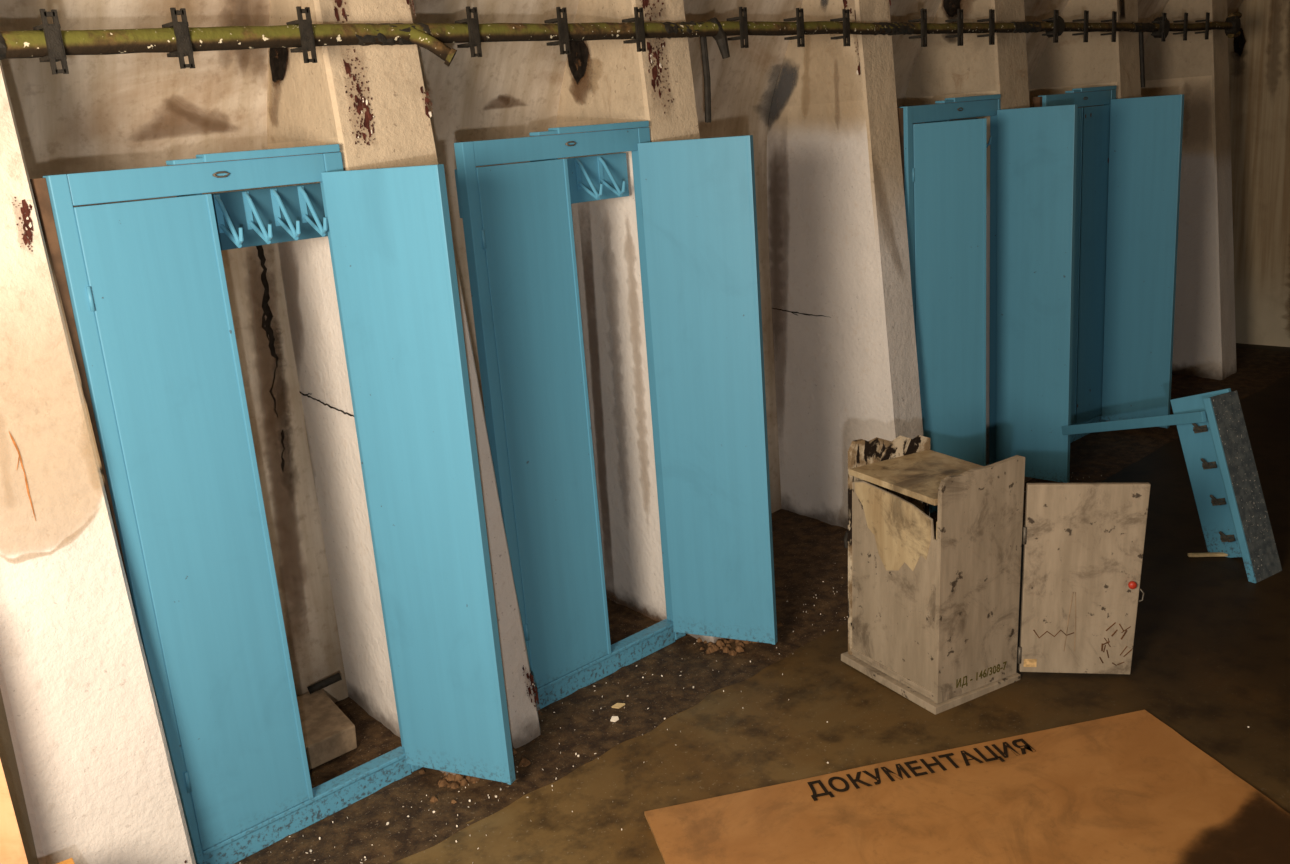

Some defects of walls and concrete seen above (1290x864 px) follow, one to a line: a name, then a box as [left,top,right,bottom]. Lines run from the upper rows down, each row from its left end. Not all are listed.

leakage [764,63,797,126]
peeling [12,197,33,252]
crack [256,245,354,472]